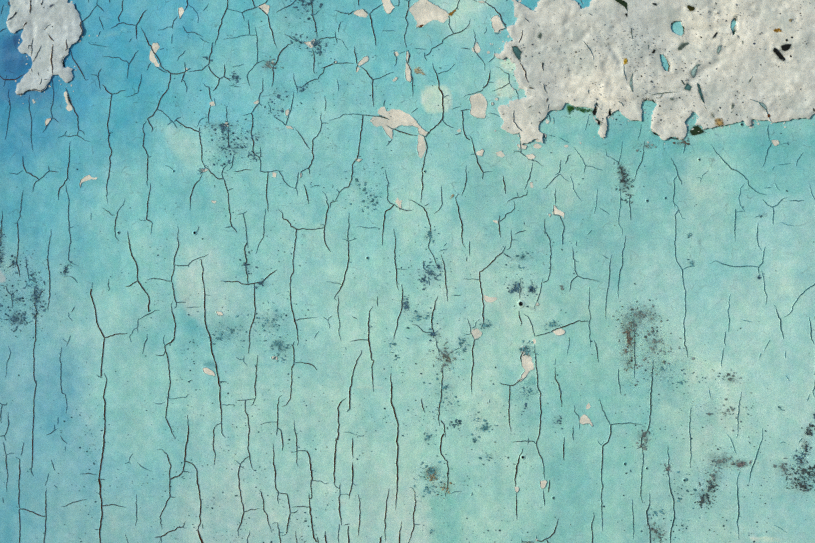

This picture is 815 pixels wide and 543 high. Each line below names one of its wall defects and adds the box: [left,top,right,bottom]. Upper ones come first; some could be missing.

flaking render [6,0,83,112]
peeling [369,106,430,159]
flaking render [468,0,815,160]
crack [671,99,815,381]
peeling [515,338,537,384]
crack [591,318,692,543]
crack [726,391,804,539]